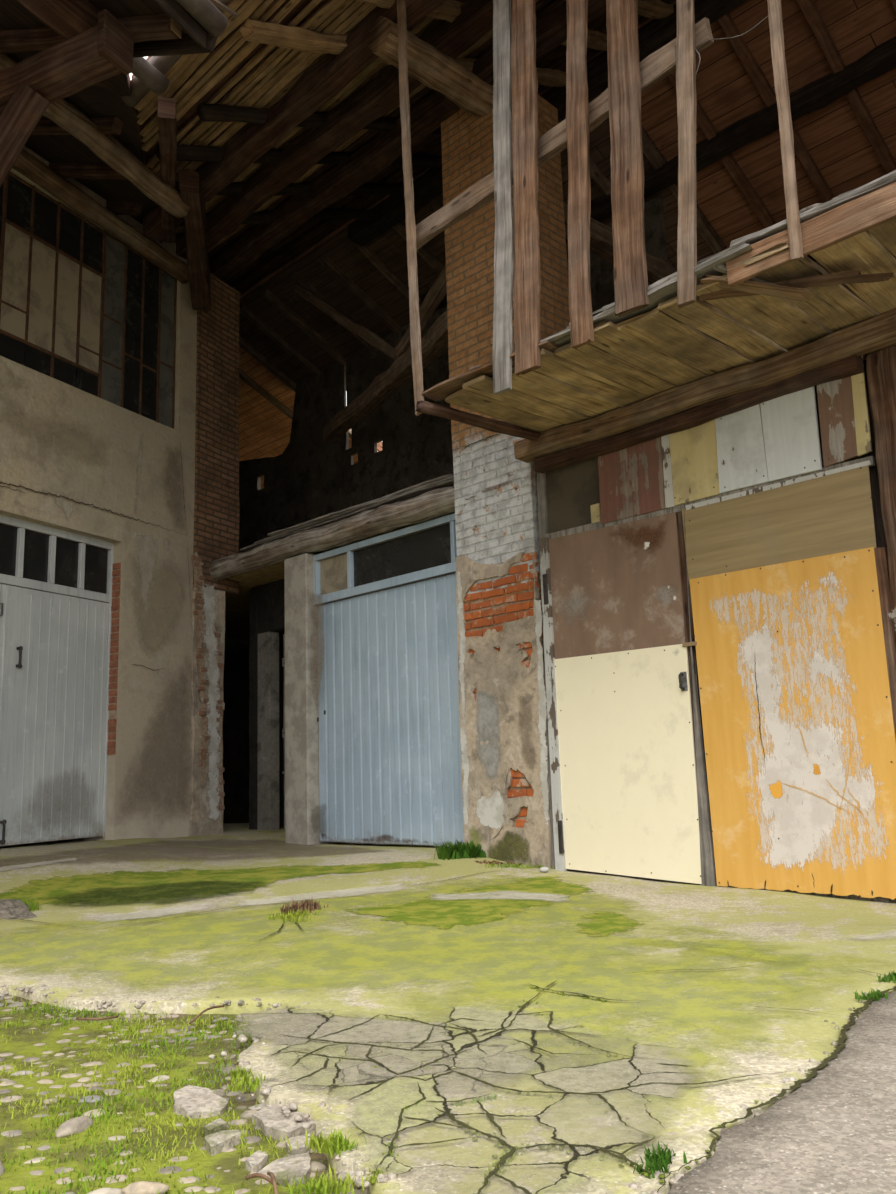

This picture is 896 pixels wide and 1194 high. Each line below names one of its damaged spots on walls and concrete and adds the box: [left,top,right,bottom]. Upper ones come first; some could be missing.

crack [0,443,192,617]
spalling [456,551,549,835]
peeling [709,571,896,873]
crack [245,968,896,1194]